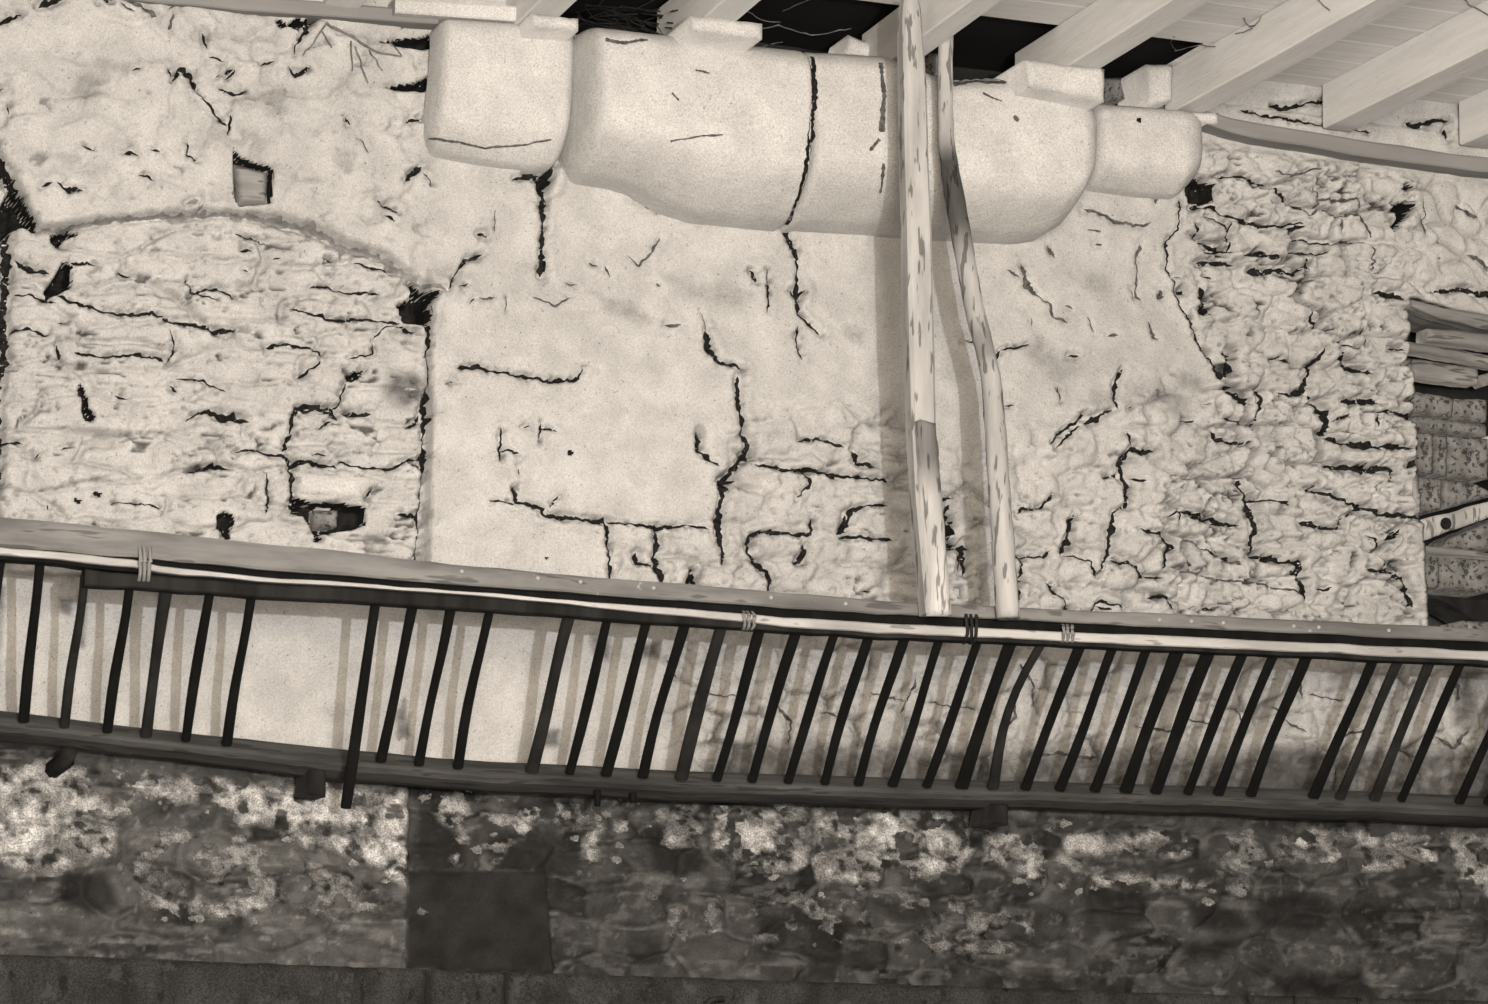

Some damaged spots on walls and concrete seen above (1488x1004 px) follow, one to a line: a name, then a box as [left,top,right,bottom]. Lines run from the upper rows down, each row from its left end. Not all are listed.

crack [0,0,61,25]
crack [104,0,310,134]
crack [605,37,648,45]
crack [670,134,723,142]
crack [749,56,819,360]
crack [0,119,660,560]
crack [964,199,1226,449]
spalling [290,497,366,543]
crack [489,312,750,585]
peeling [0,763,1488,960]